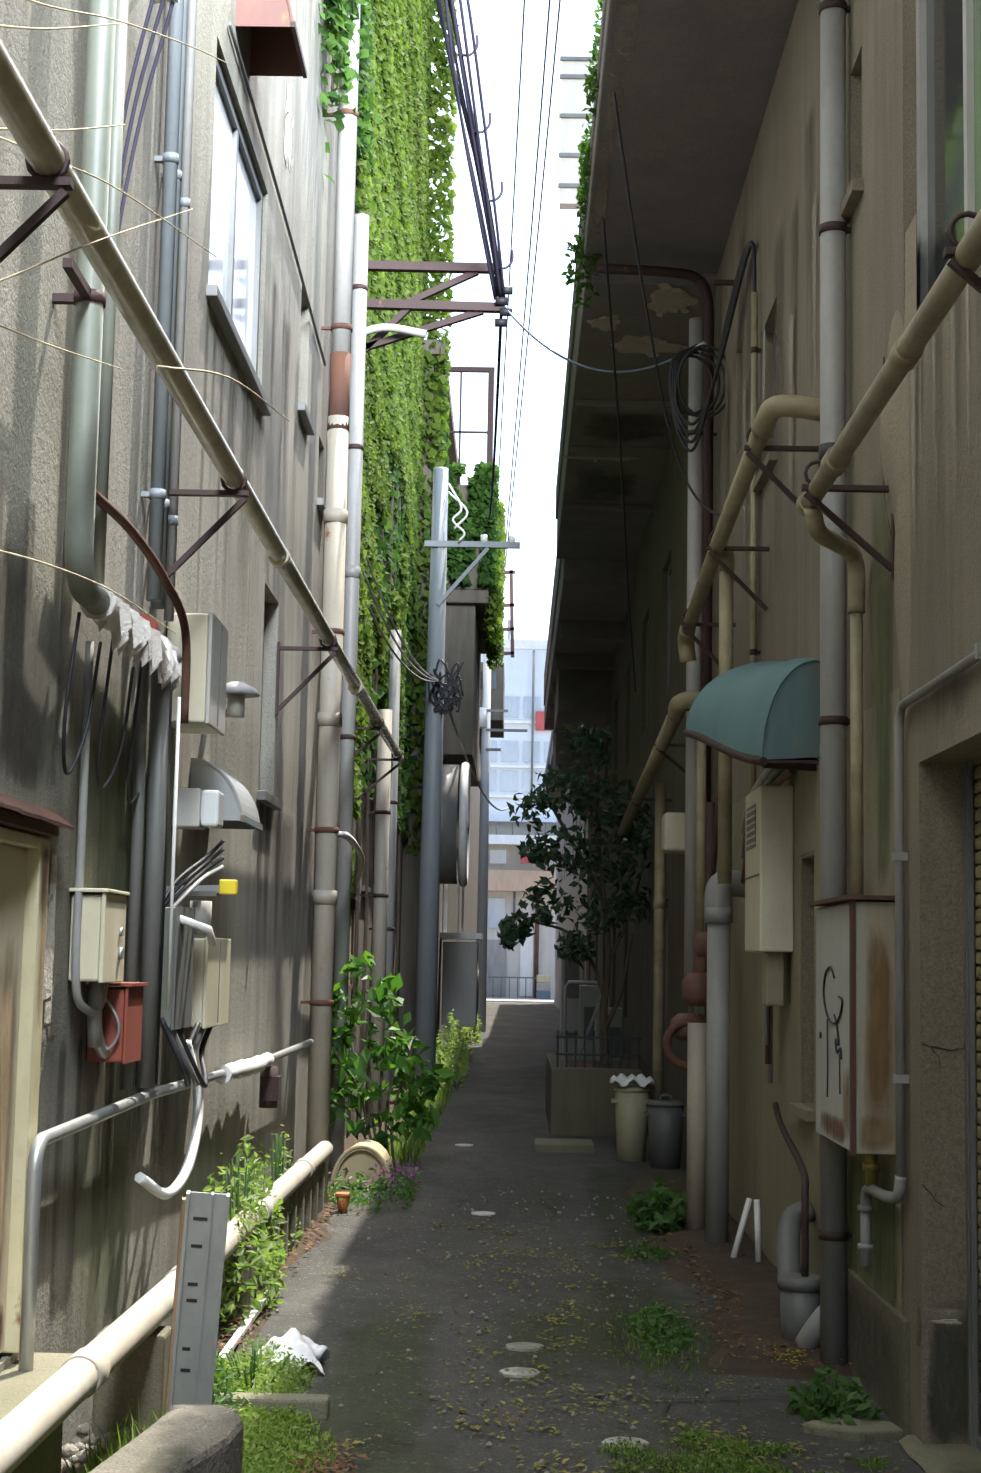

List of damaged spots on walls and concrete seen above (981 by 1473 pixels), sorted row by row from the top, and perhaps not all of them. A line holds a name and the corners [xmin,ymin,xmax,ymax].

corrosion [824,956,890,1148]